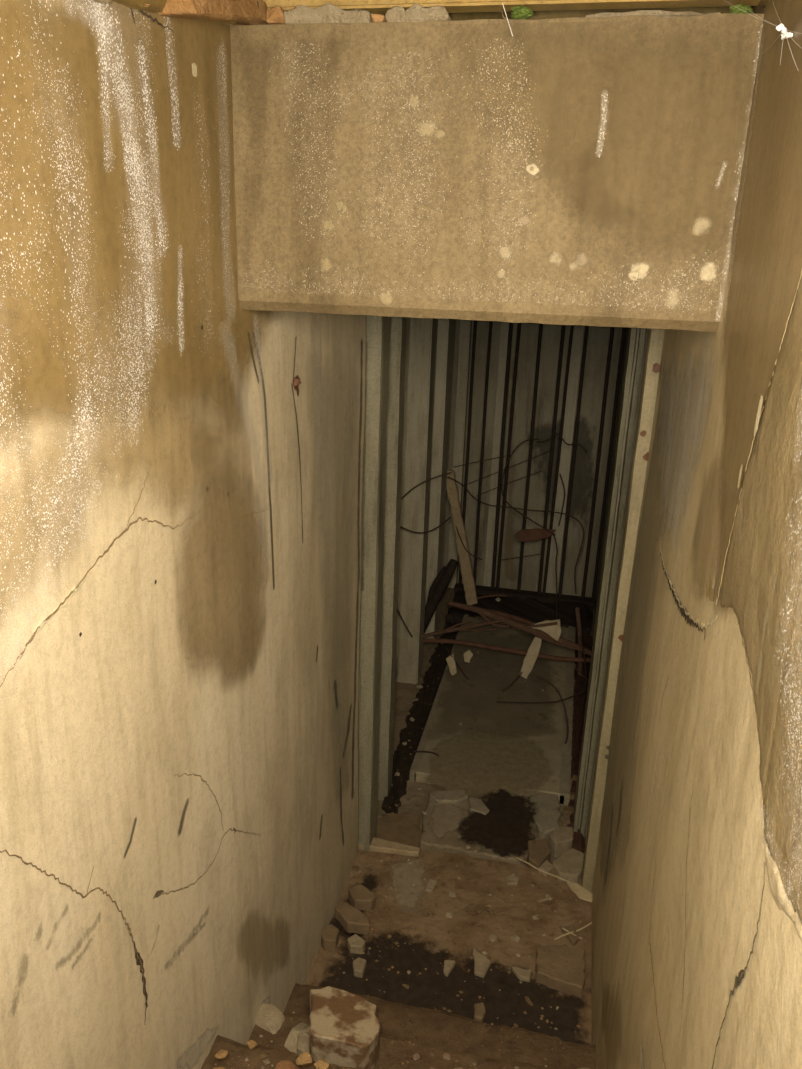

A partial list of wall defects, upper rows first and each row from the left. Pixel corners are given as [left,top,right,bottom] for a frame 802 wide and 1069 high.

crack [228,332,275,590]
crack [291,338,303,543]
water stain [0,0,802,720]
crack [0,463,200,687]
water stain [334,340,367,846]
crack [660,551,756,718]
crack [0,849,148,1019]
crack [153,773,258,899]